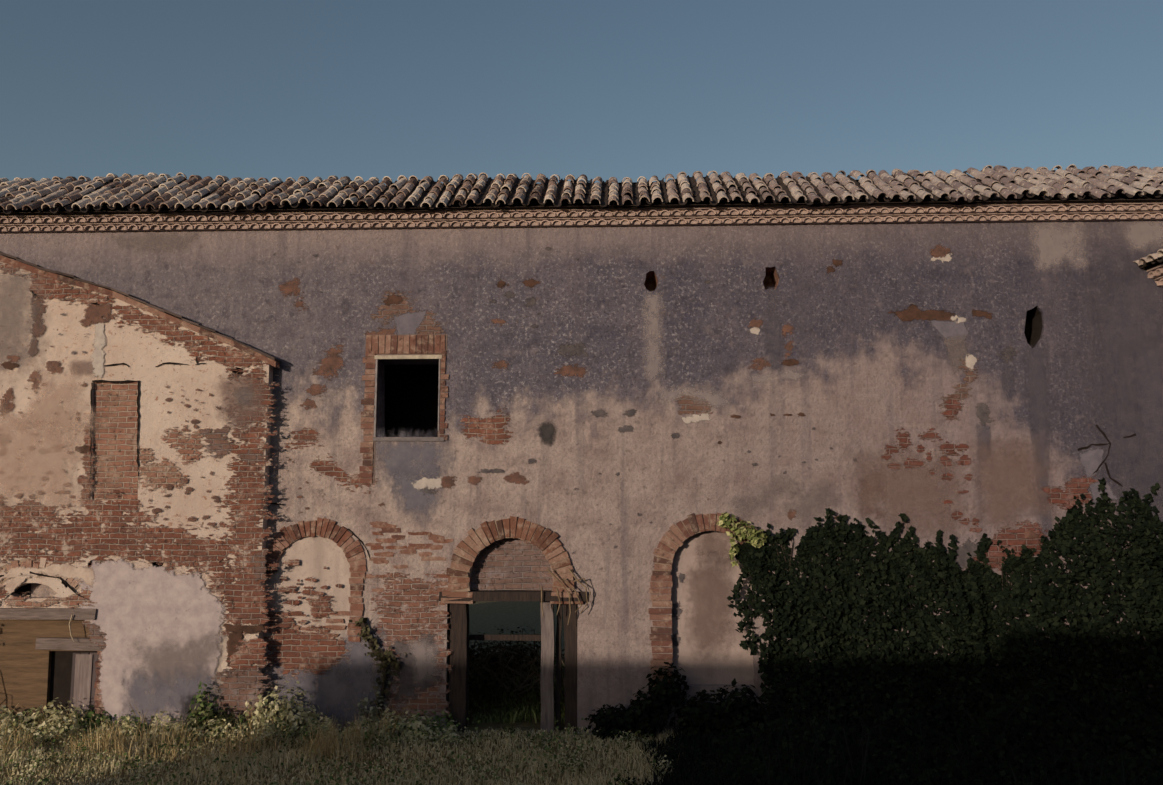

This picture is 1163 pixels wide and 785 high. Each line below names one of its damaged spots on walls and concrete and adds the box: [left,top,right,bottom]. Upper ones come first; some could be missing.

water stain [1034,223,1084,267]
water stain [1128,220,1163,247]
peeling [365,290,444,335]
flaking render [0,261,385,729]
water stain [376,434,444,518]
water stain [539,422,556,446]
flaking render [880,428,991,570]
spalling [888,304,994,426]
flaking render [1041,449,1118,510]
crack [1078,425,1136,487]
water stain [1100,265,1163,538]
spalling [365,521,454,730]